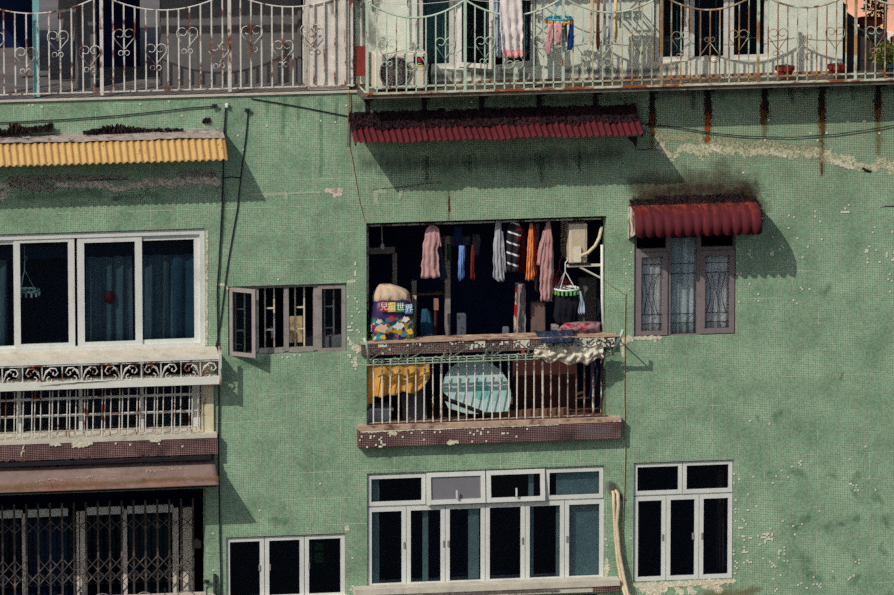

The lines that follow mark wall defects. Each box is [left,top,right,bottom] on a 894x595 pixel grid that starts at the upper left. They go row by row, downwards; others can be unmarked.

rust [648,92,658,136]
rust [704,91,713,143]
rust [760,88,769,125]
rust [818,87,826,148]
spalling [640,121,894,178]
water stain [636,173,757,201]
spalling [572,335,662,358]
spalling [359,424,559,448]